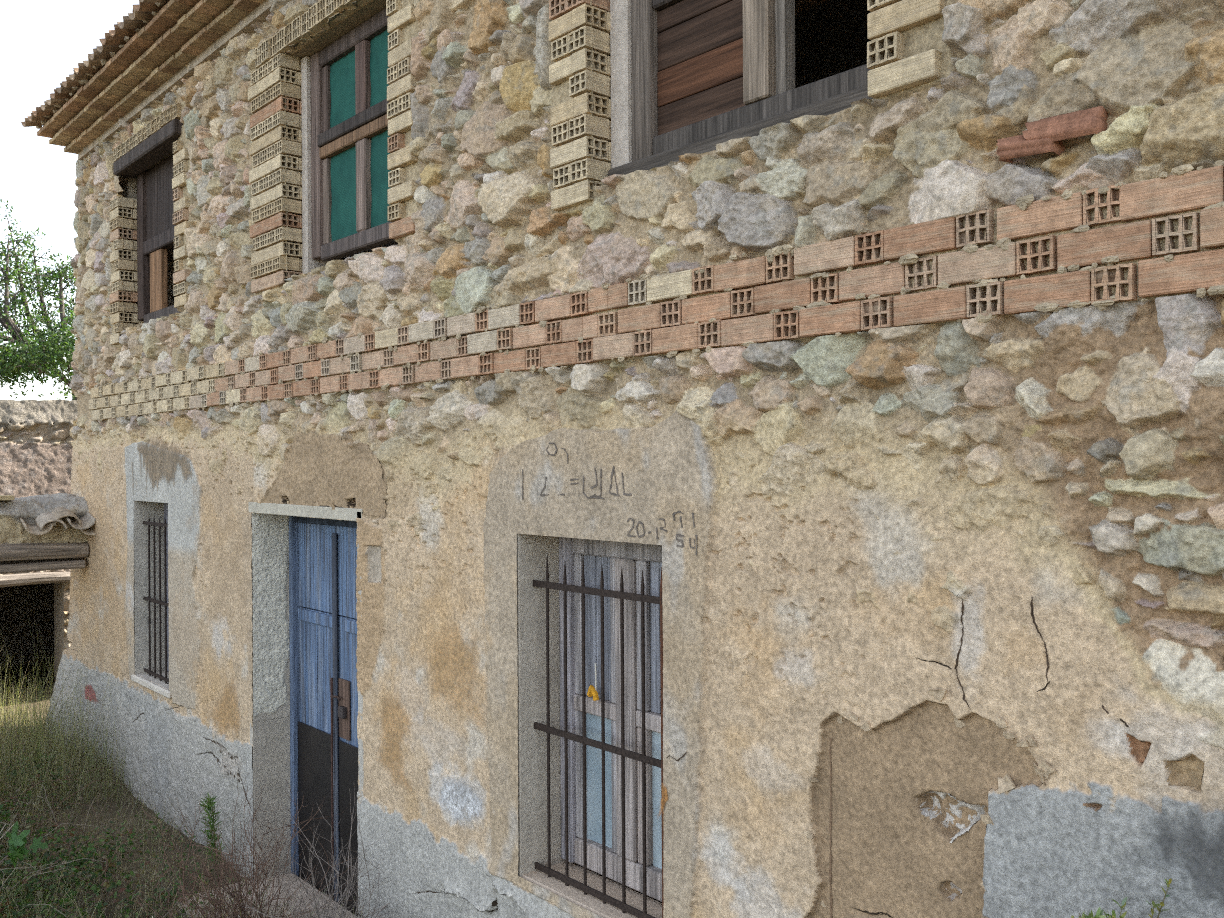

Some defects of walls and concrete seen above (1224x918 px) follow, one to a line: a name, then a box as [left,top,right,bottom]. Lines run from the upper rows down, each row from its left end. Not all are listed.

crack [917,595,970,708]
crack [1030,598,1050,692]
flaking render [804,689,1056,918]
spalling [1124,733,1151,762]
spalling [1165,755,1204,790]